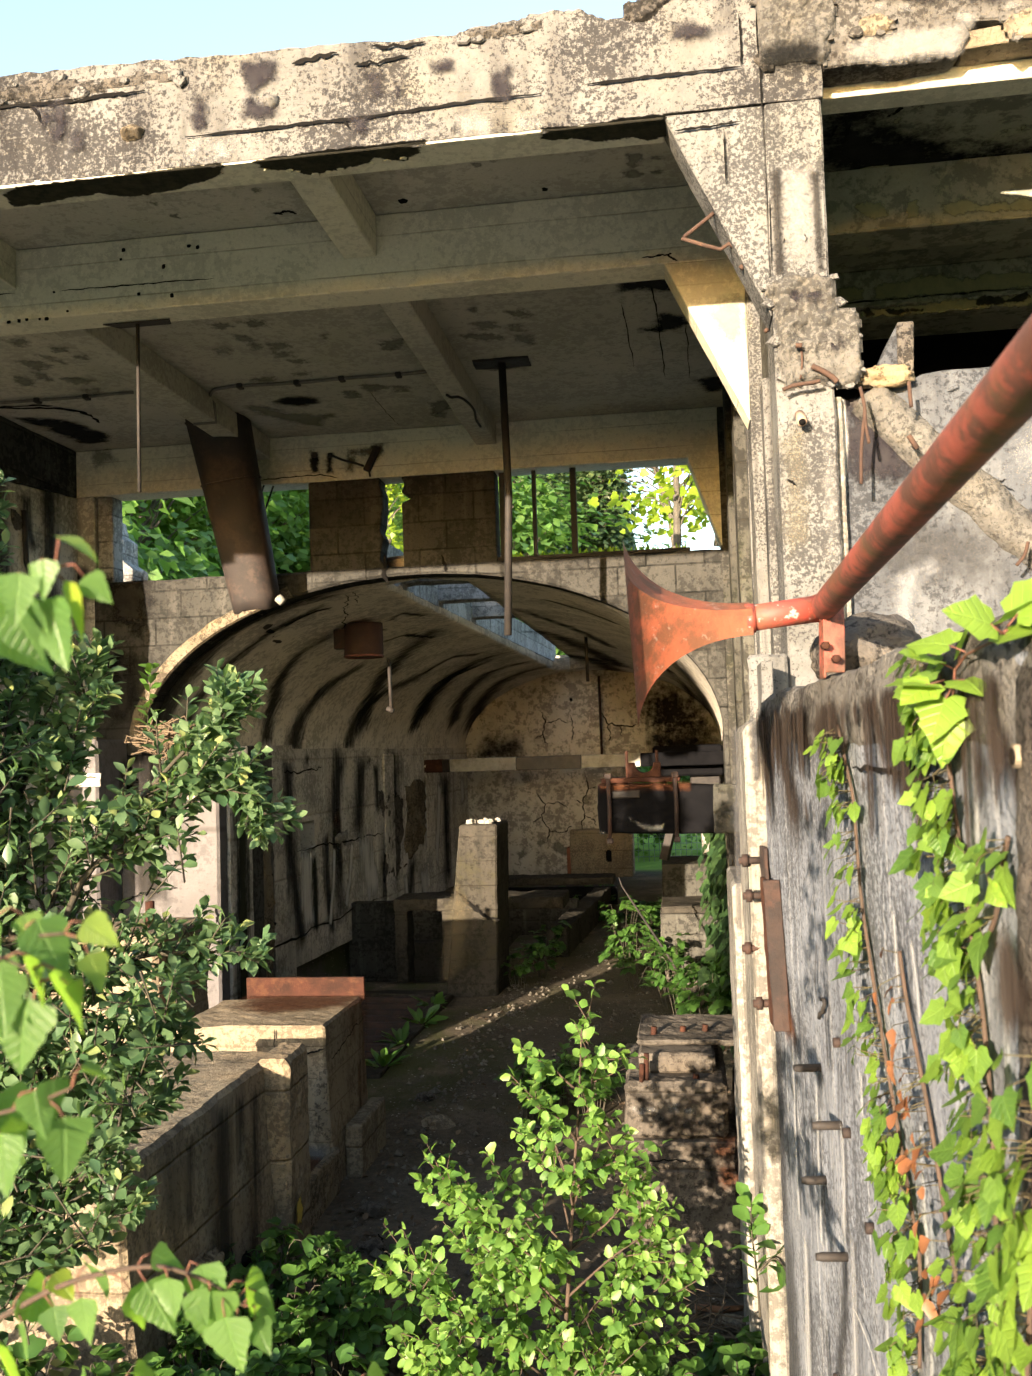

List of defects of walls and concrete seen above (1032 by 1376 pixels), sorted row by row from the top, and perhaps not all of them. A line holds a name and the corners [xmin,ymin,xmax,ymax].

spalling [999,7,1032,42]
peeling [252,137,428,176]
peeling [3,163,225,207]
spalling [681,211,732,252]
peeling [976,292,1031,306]
spalling [758,270,924,484]
water stain [957,672,1017,850]
water stain [733,690,923,929]